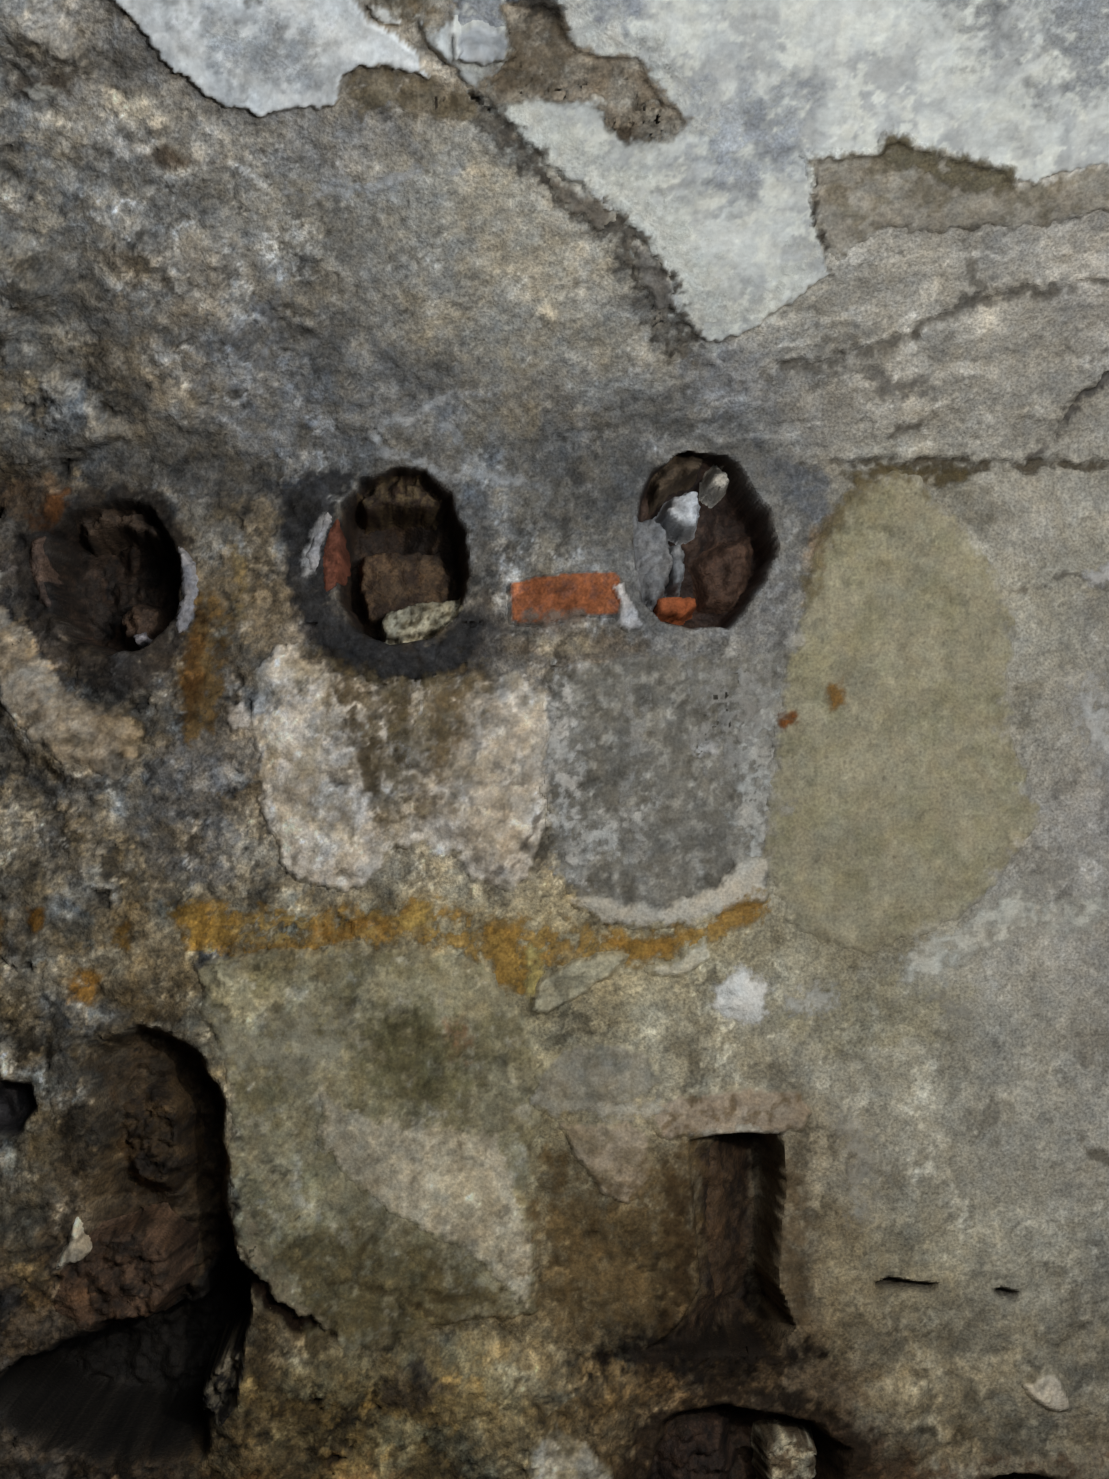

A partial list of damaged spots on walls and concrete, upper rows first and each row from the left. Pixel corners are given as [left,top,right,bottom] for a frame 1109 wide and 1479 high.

peeling [108,0,1109,364]
crack [781,279,1109,475]
crack [1045,573,1106,589]
corrosion [173,888,770,995]
spalling [642,1132,796,1357]
crack [249,1270,335,1335]
peeling [915,1446,1109,1479]